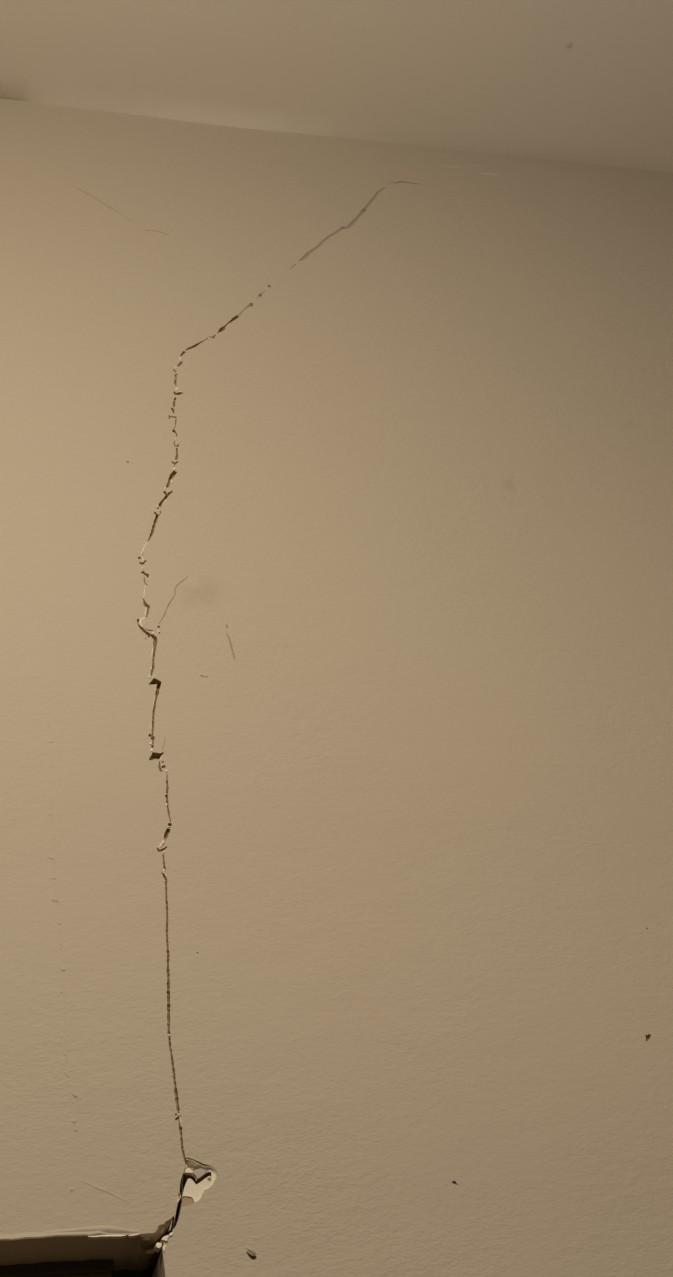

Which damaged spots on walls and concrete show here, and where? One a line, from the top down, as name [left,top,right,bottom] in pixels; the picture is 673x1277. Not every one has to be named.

flaking render [88,1157,218,1254]
crack [137,181,418,1230]